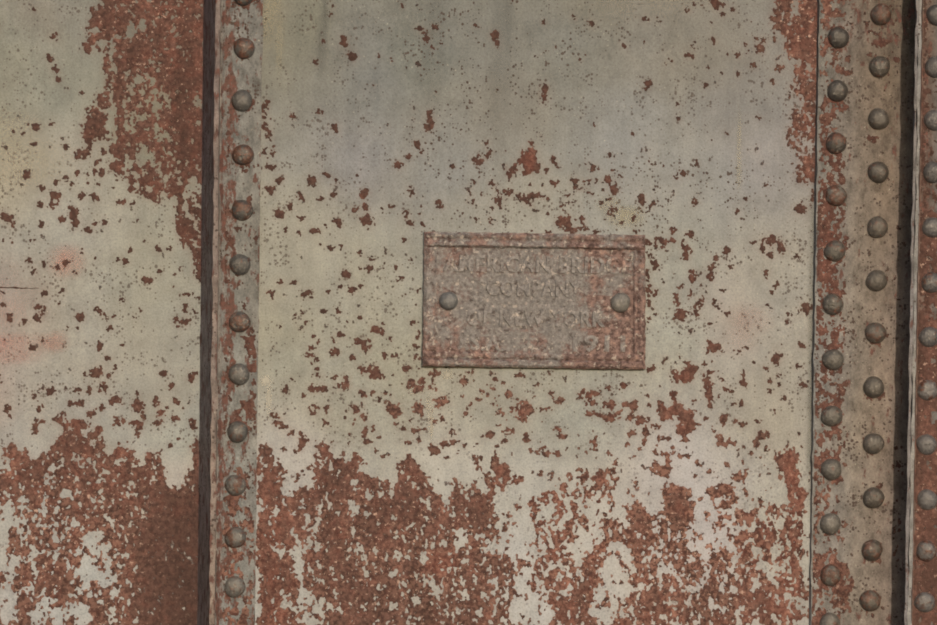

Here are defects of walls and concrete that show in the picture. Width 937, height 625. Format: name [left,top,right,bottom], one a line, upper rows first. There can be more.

corrosion [0,212,16,244]
corrosion [0,288,65,326]
corrosion [12,115,55,147]
corrosion [20,0,204,338]
corrosion [222,0,898,625]
corrosion [863,4,911,96]
corrosion [913,0,937,625]
corrosion [0,340,199,625]